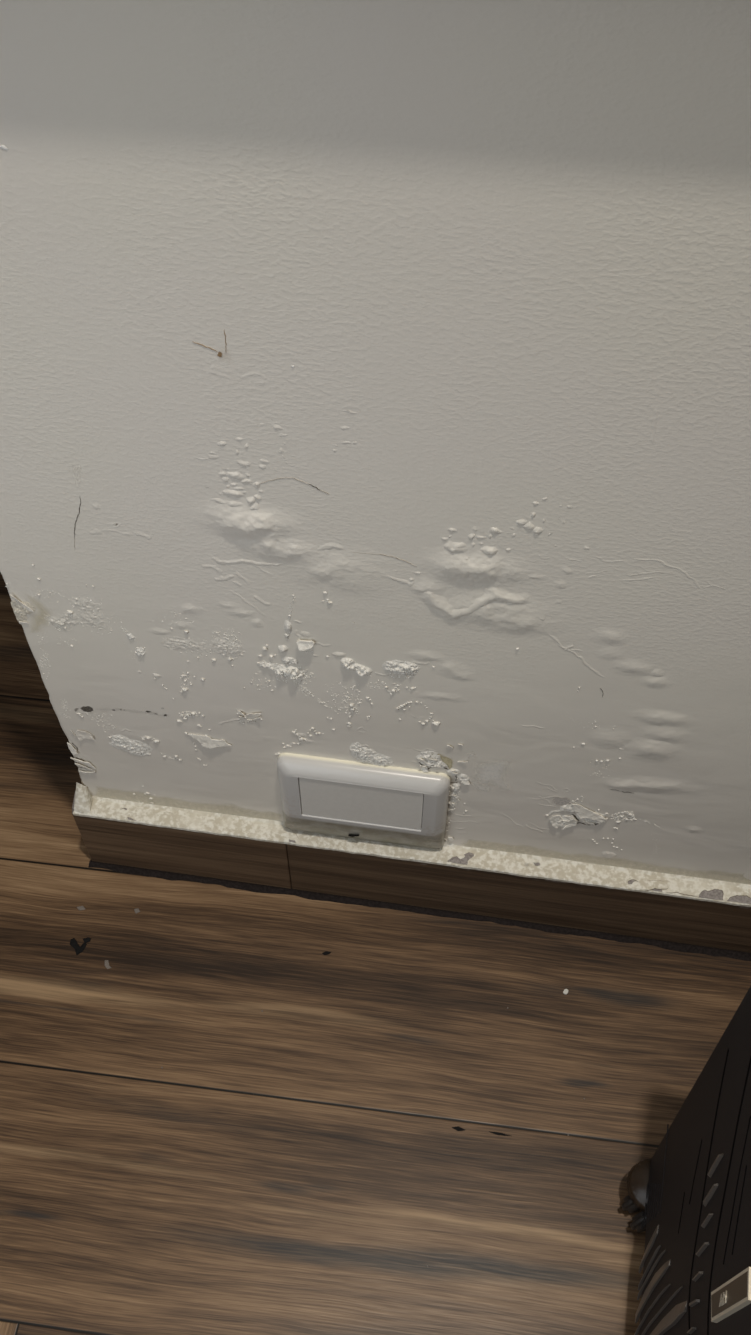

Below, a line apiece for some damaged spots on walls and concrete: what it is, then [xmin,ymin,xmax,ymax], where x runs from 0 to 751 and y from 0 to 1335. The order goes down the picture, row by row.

peeling [293,620,332,658]
spalling [67,706,96,814]
peeling [185,708,262,766]
peeling [531,781,660,830]